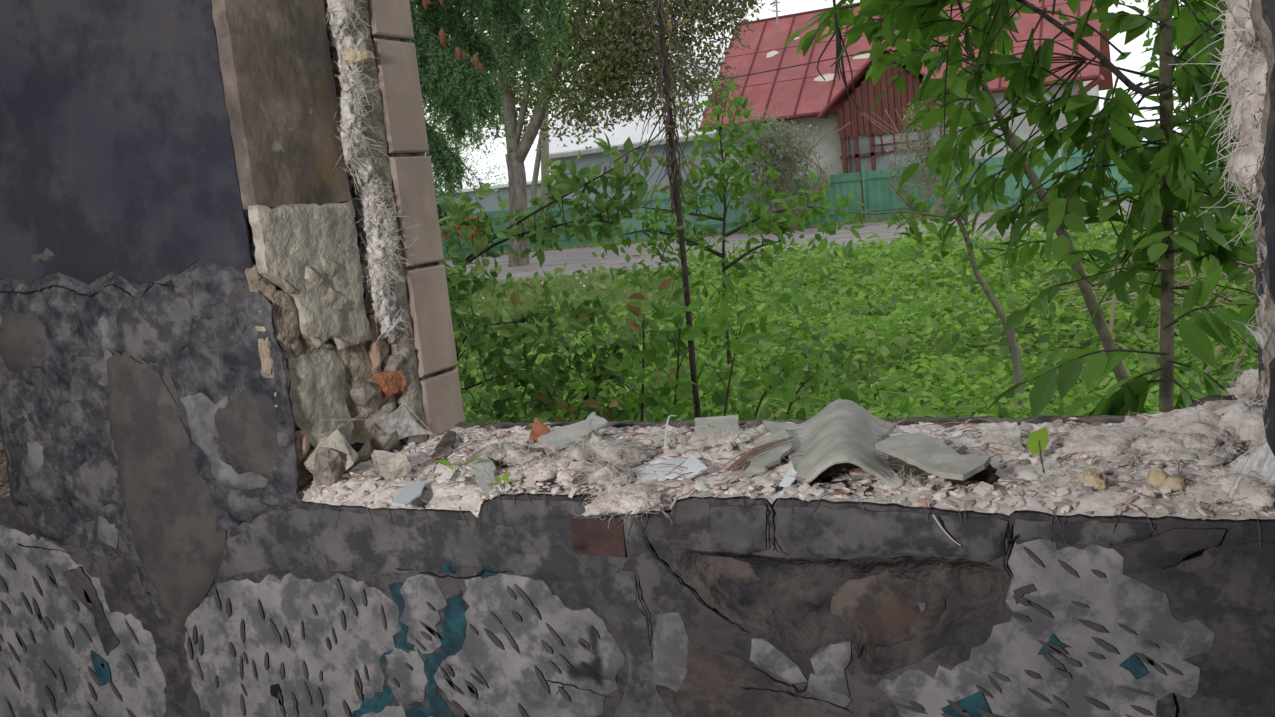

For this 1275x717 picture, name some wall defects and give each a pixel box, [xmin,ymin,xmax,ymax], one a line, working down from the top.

flaking render [0,0,410,619]
peeling [438,591,467,656]
peeling [352,684,394,717]
peeling [405,661,454,717]